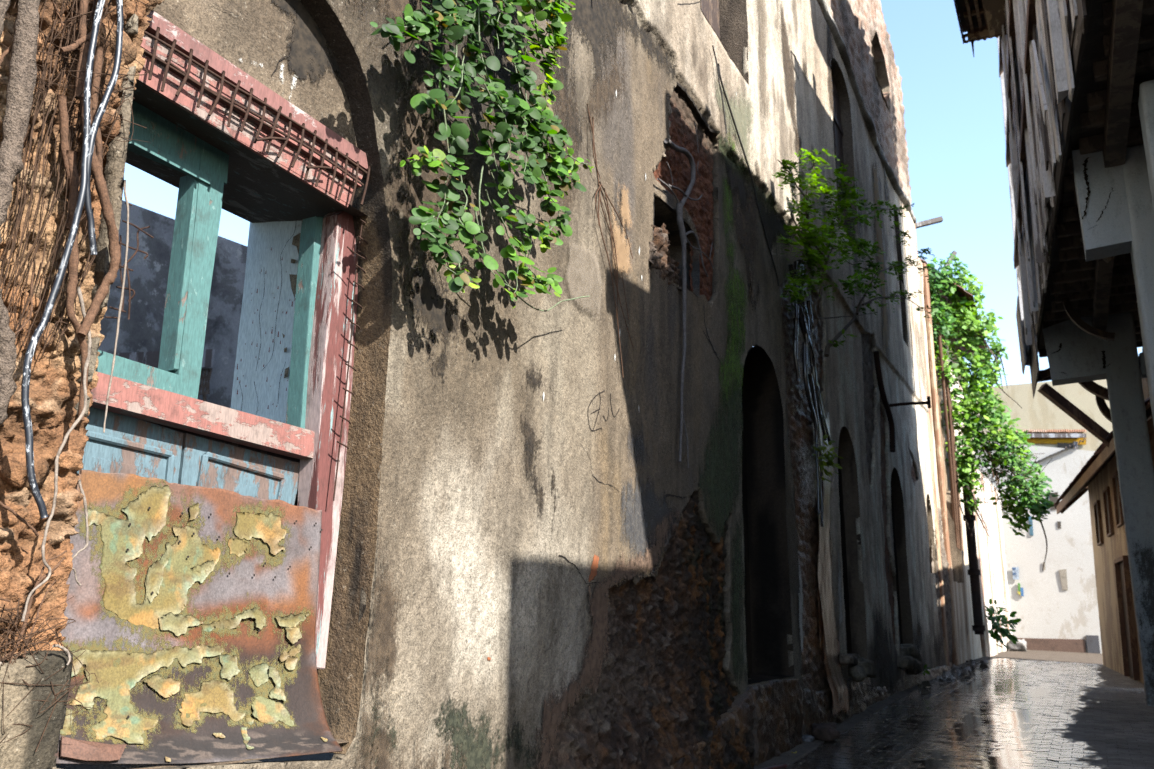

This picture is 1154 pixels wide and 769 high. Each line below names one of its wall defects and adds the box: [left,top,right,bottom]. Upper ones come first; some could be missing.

leakage [550,0,677,208]
flaking render [648,88,715,301]
crack [1082,157,1114,230]
flaking render [0,0,371,750]
flaking render [780,271,831,691]
peeling [535,506,680,769]
leakage [1132,542,1154,703]